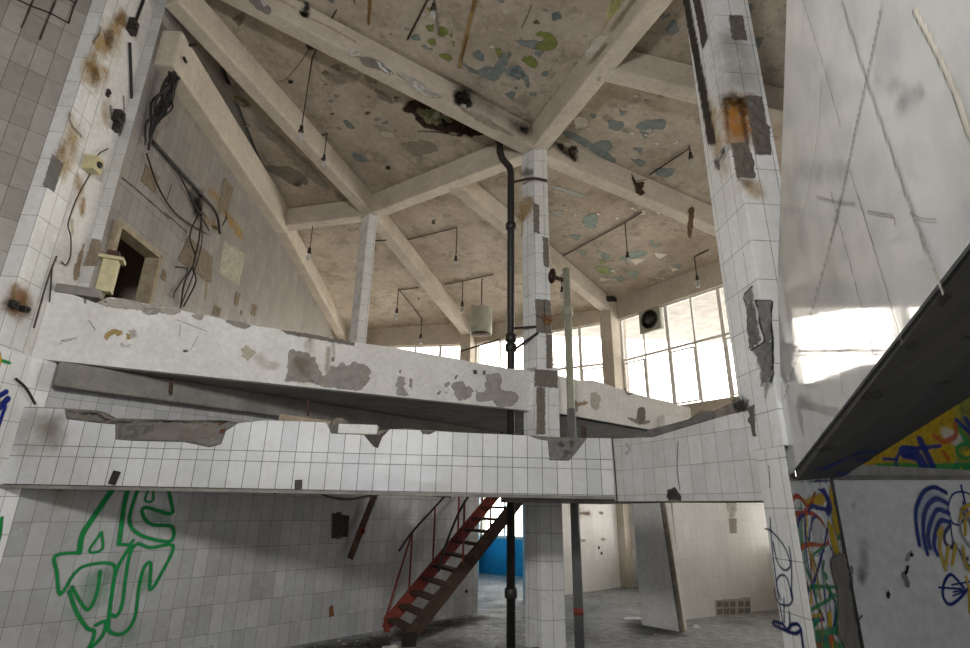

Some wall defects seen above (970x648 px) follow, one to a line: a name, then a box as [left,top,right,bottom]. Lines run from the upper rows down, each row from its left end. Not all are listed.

corrosion [85,13,125,82]
peeling [405,0,562,100]
peeling [729,4,764,48]
spalling [321,49,514,156]
peeling [562,109,675,196]
corrosion [711,95,752,169]
peeling [731,95,771,178]
flaking render [281,329,354,346]
flaking render [285,349,371,391]
flaking render [437,370,518,407]
spalling [531,299,586,461]
spalling [743,286,774,386]